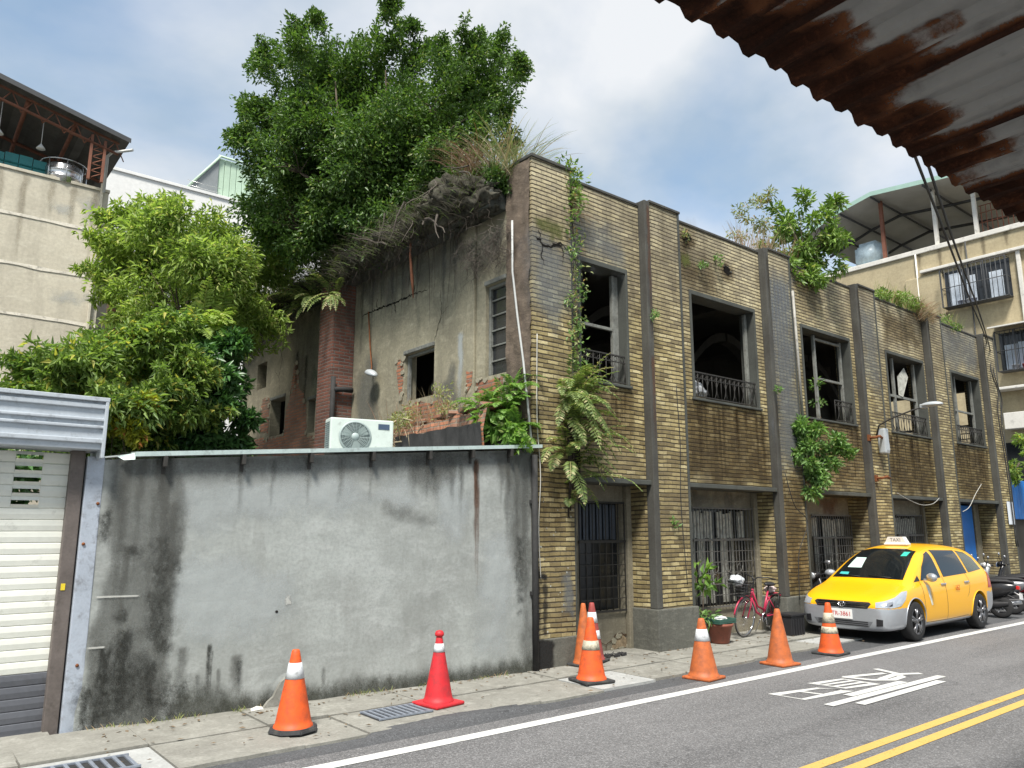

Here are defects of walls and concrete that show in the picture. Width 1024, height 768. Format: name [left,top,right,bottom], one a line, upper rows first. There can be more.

rust [655,0,1024,223]
spalling [249,361,314,456]
crack [362,285,444,337]
spalling [394,159,561,450]
crack [535,230,566,264]
water stain [76,458,358,731]